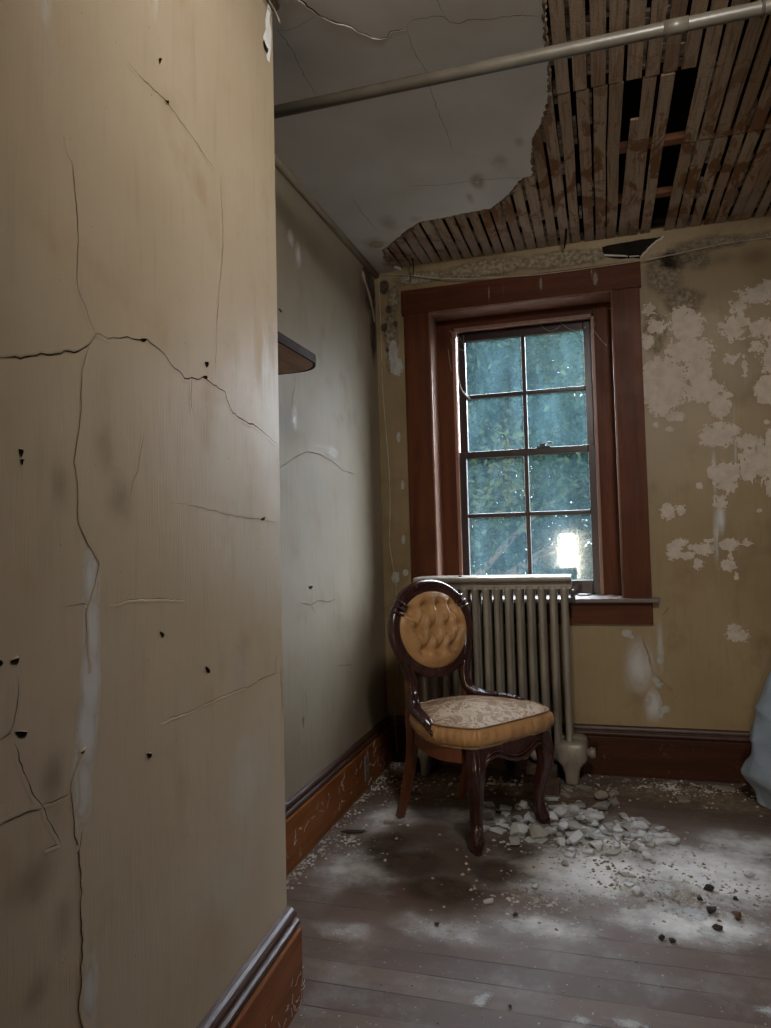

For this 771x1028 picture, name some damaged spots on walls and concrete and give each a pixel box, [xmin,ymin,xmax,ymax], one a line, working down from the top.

crack [277,0,526,151]
spalling [382,15,771,276]
spalling [541,0,758,47]
peeling [641,279,771,511]
peeling [659,501,686,521]
peeling [666,537,754,580]